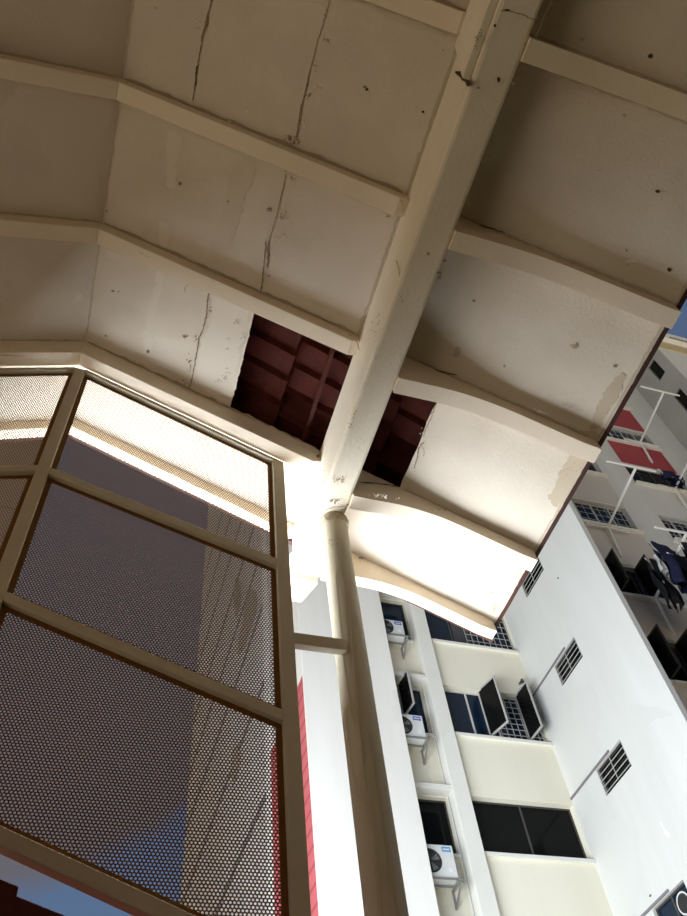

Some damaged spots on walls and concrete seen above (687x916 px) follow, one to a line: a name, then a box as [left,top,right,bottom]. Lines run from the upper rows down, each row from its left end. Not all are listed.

crack [192,0,212,100]
crack [296,0,330,141]
crack [260,175,286,291]
crack [190,293,209,387]